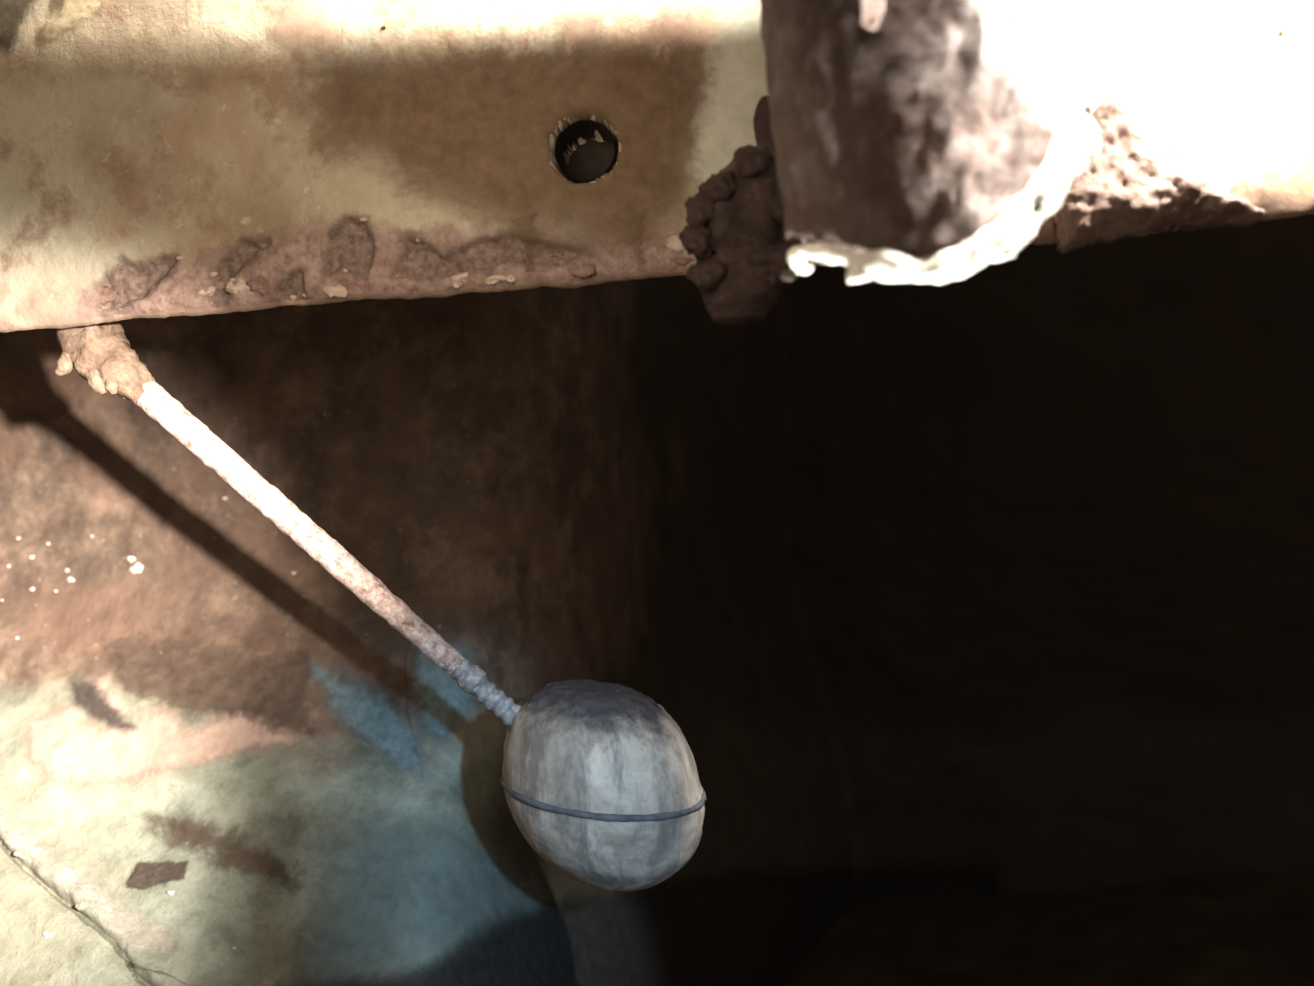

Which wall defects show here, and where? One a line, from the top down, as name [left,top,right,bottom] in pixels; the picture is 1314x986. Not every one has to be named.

peeling [862,0,884,30]
crack [0,810,173,951]